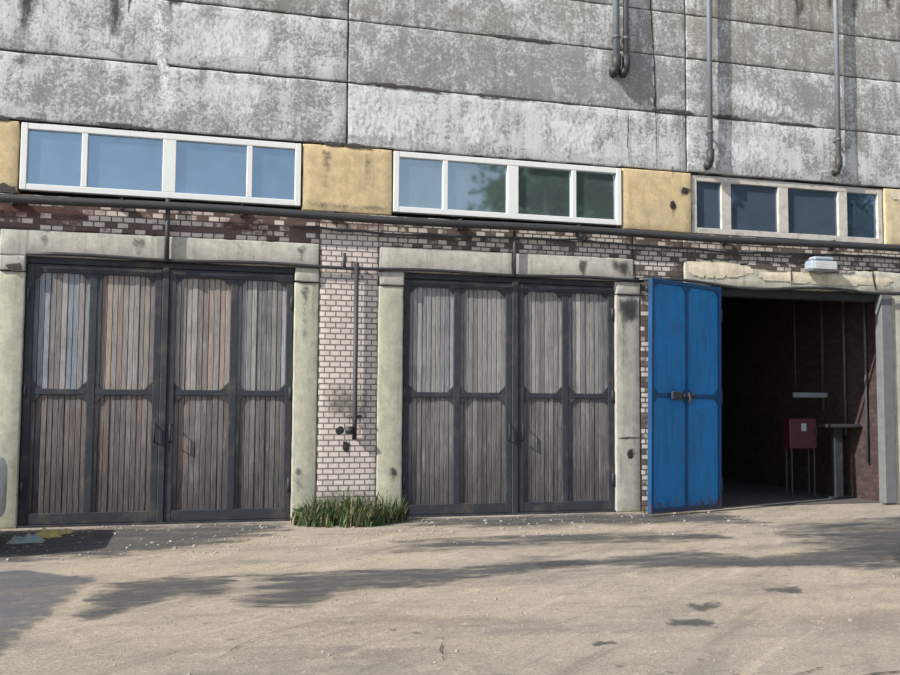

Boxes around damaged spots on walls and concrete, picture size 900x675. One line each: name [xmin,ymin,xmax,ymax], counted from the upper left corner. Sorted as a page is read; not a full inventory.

damp [22,0,31,24]
damp [112,0,131,32]